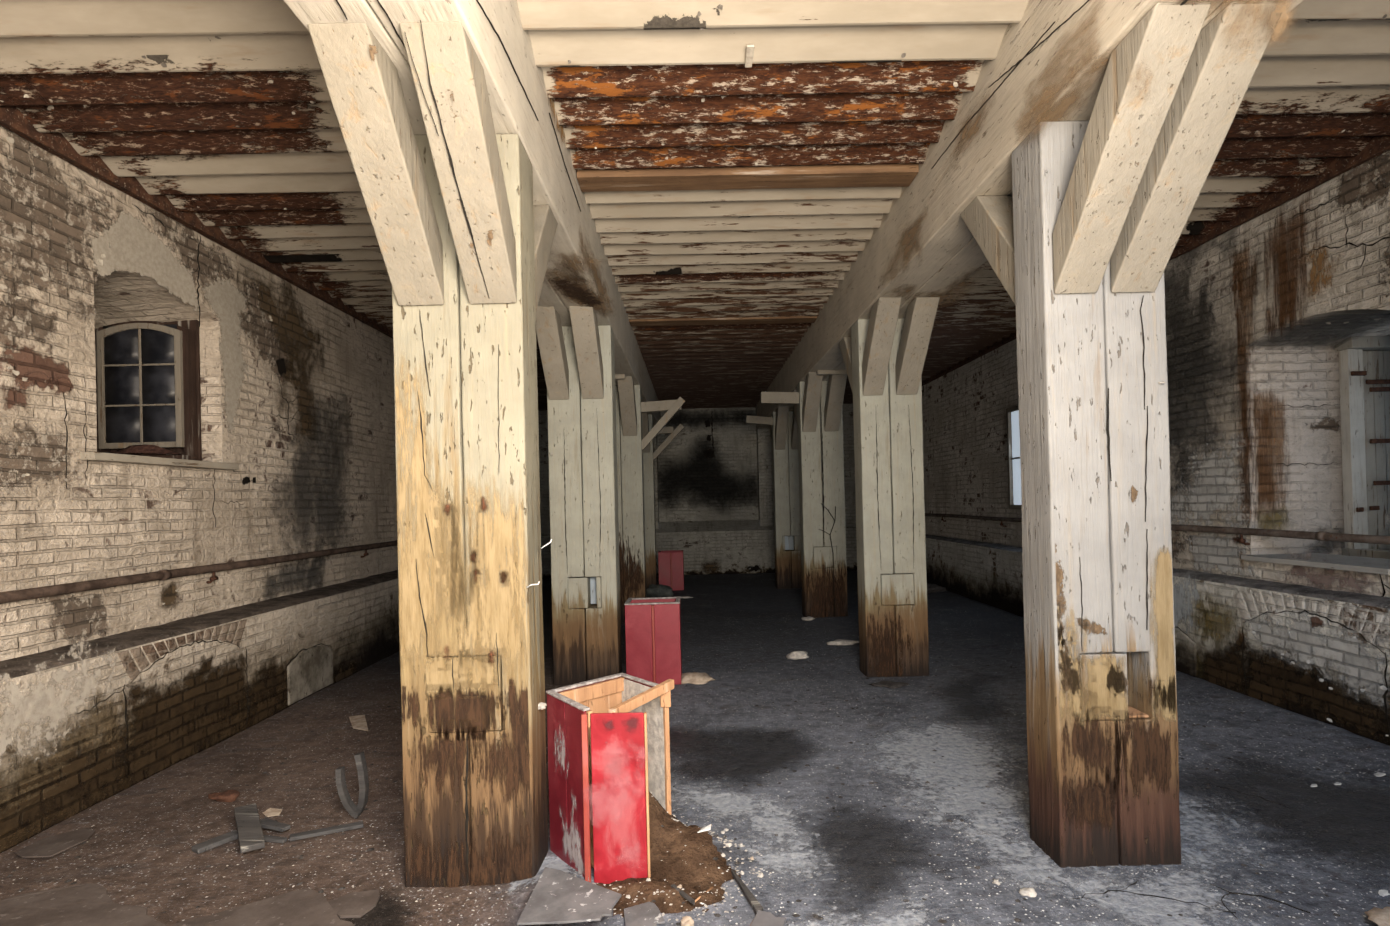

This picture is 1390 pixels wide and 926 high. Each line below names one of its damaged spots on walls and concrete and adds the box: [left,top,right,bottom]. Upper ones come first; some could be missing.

peeling [644,4,723,30]
peeling [0,128,122,504]
damp [243,280,348,599]
crack [377,0,489,297]
peeling [1186,221,1204,235]
damp [1164,232,1390,743]
rust [1233,204,1332,522]
rust [1176,89,1390,246]
peeling [1333,150,1390,297]
damp [0,641,291,853]
damp [669,729,810,783]
damp [1061,678,1390,868]